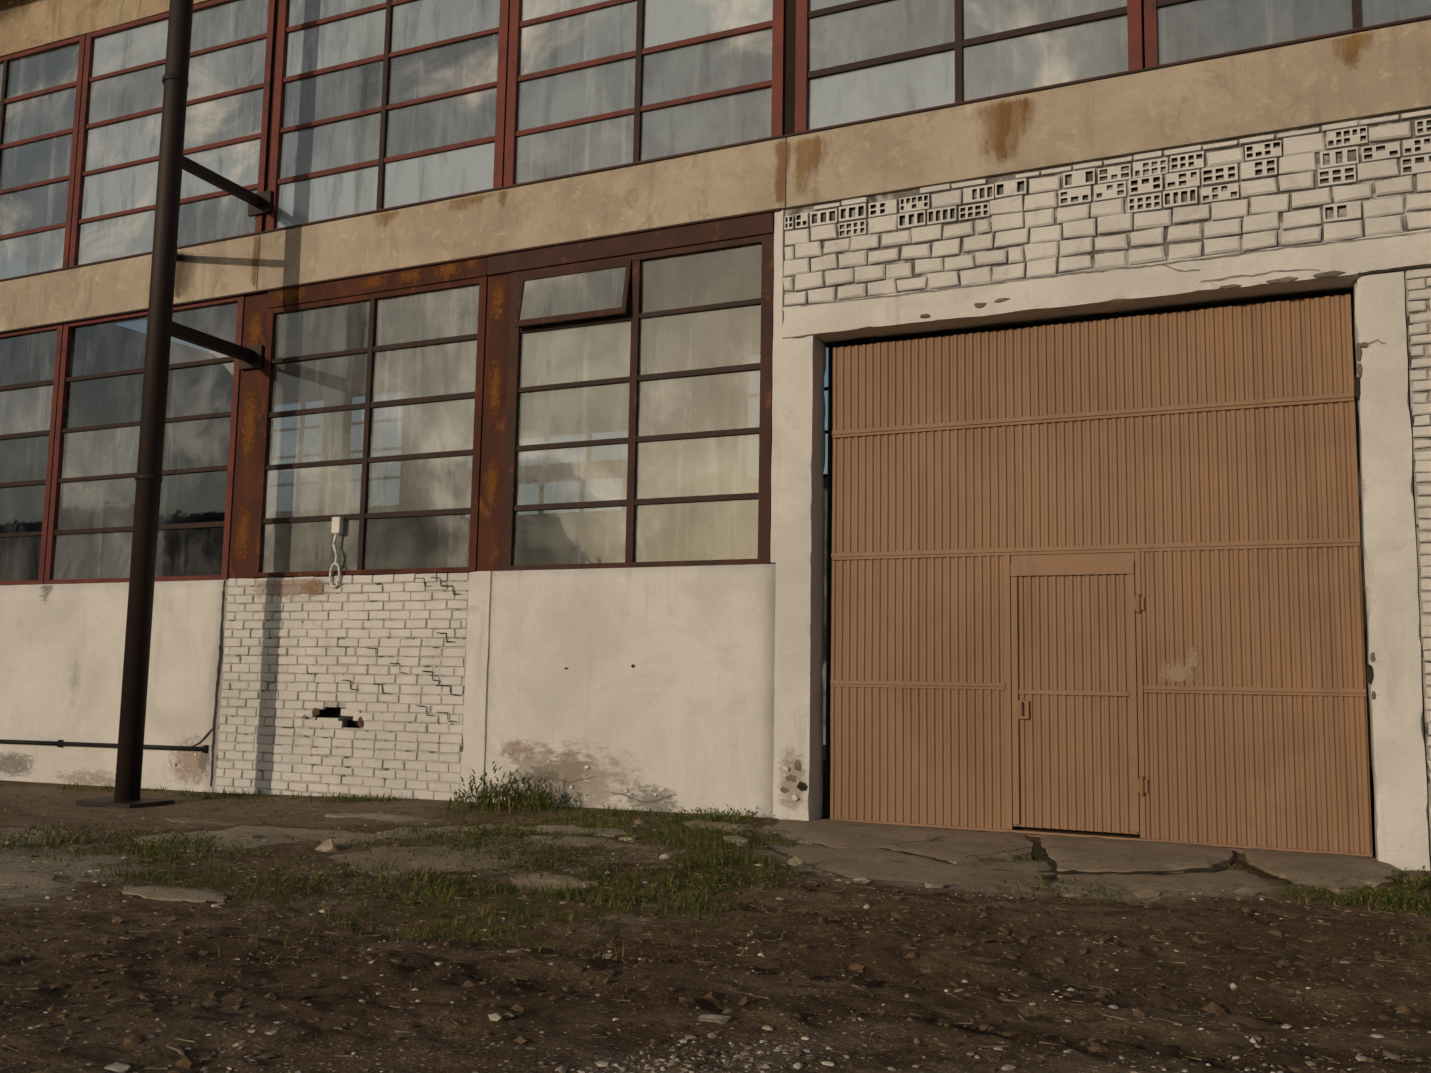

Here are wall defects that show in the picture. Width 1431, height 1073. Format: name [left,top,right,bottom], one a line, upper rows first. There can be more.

rust [985,99,1030,157]
rust [775,136,820,201]
peeling [368,648,459,695]
spalling [301,707,363,728]
spalling [780,760,808,801]
crack [810,836,1290,883]